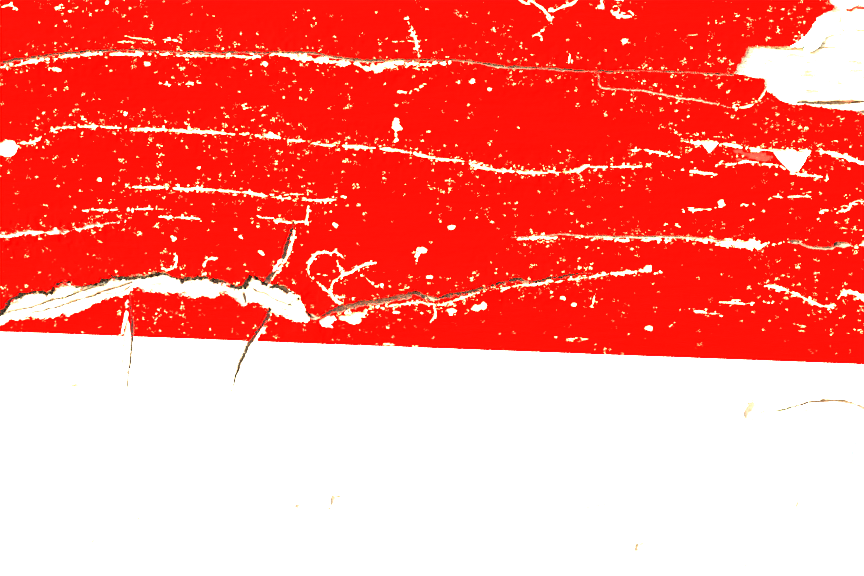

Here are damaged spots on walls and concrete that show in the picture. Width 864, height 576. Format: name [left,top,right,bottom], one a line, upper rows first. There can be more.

crack [0,17,766,111]
peeling [735,0,864,114]
spalling [392,118,402,143]
peeling [681,138,864,179]
crack [510,233,864,251]
crack [0,220,676,409]
crack [761,399,864,413]